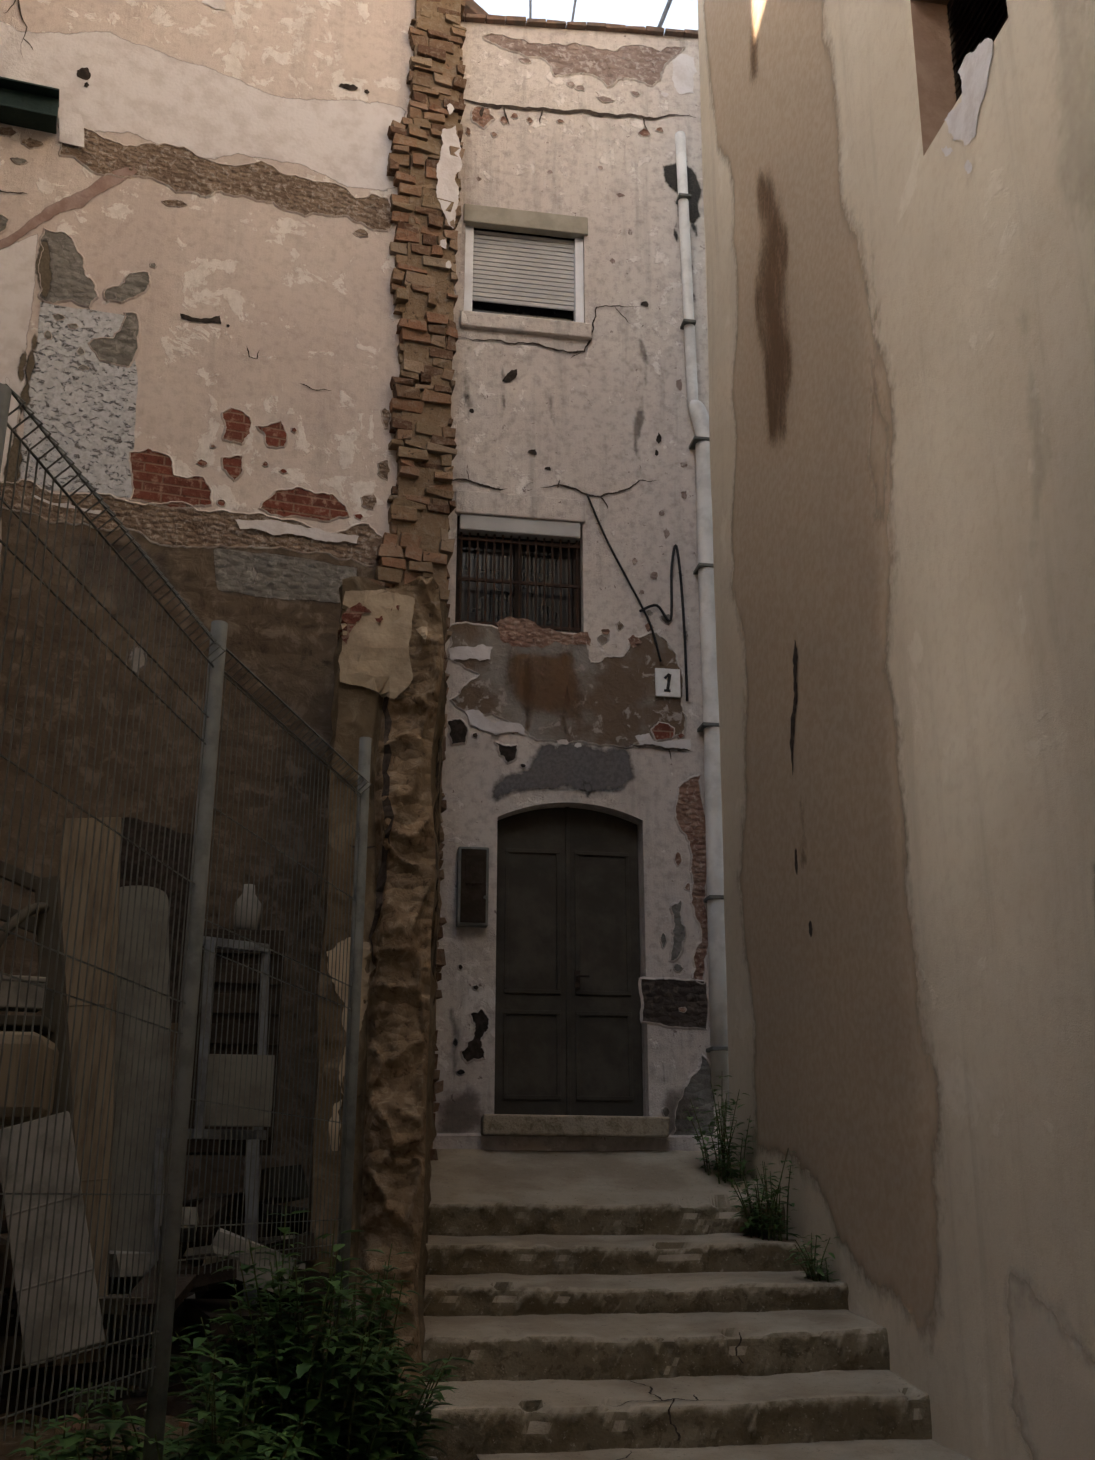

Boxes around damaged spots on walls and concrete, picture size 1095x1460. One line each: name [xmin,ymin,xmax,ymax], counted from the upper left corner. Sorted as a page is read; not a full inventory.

crack [5,0,33,57]
crack [464,99,696,129]
flaking render [0,121,395,238]
peeling [0,228,391,567]
flaking render [446,558,689,769]
flaking render [451,984,491,1076]
peeling [328,1100,342,1151]
crack [619,1380,701,1441]